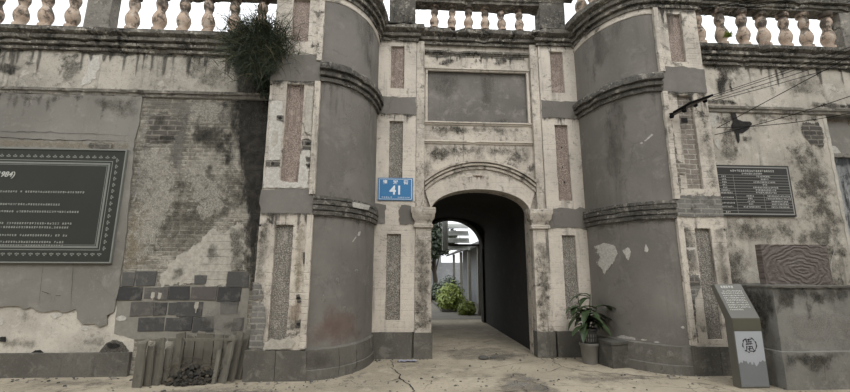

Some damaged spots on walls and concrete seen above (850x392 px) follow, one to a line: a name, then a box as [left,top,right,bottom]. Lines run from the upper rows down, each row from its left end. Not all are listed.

water stain [0,49,41,74]
water stain [64,51,315,289]
water stain [668,65,822,159]
flaking render [801,122,841,153]
flaking render [0,111,266,353]
flaking render [594,243,631,274]
water stain [722,255,847,328]